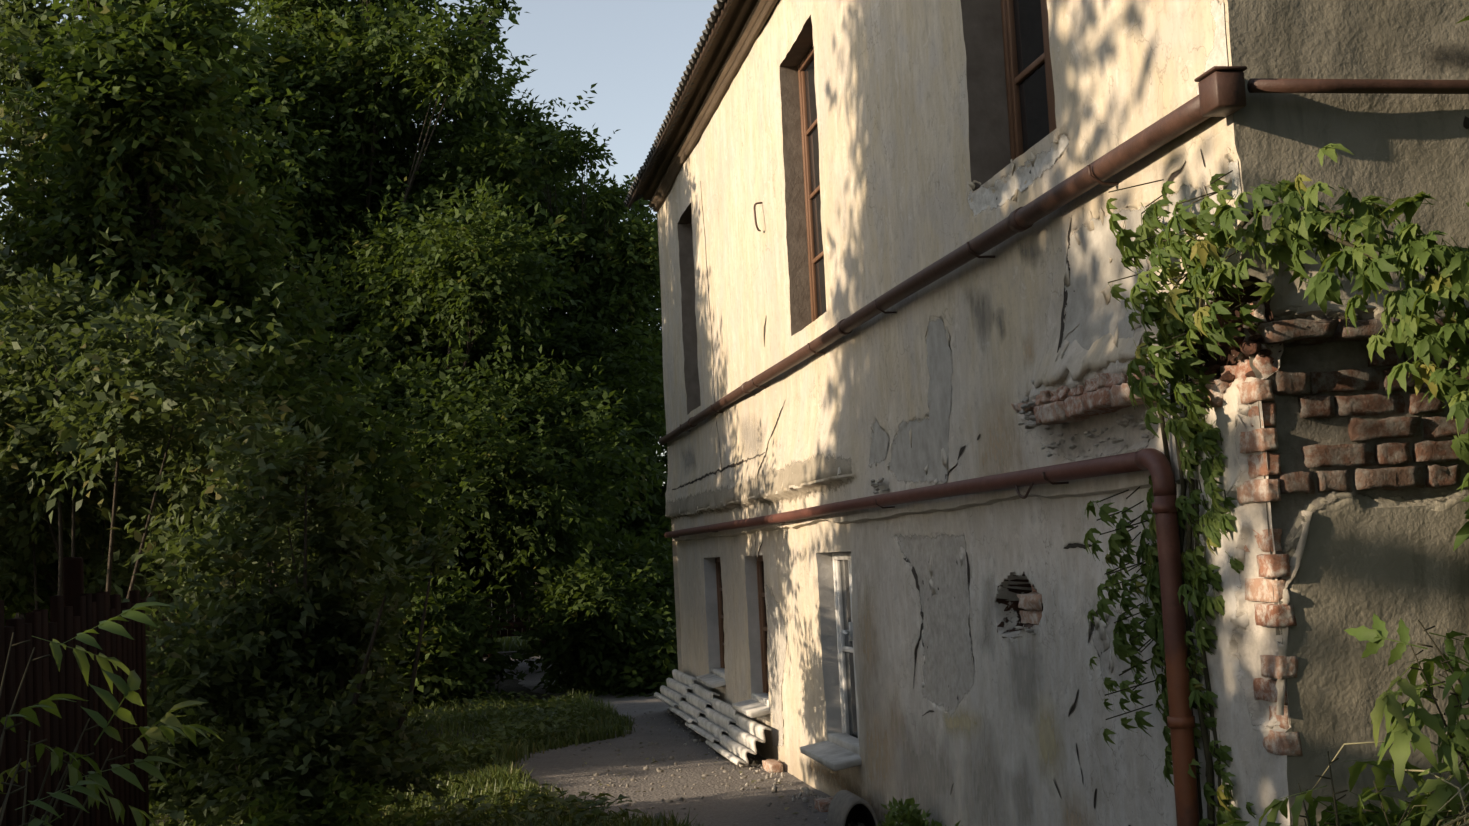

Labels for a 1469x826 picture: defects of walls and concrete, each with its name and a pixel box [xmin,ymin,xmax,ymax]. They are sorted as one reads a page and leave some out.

flaking render [967,131,1071,219]
spalling [1011,147,1241,461]
peeling [868,314,953,487]
hole [996,572,1043,640]
spalling [1192,300,1469,756]
crack [1053,687,1097,809]